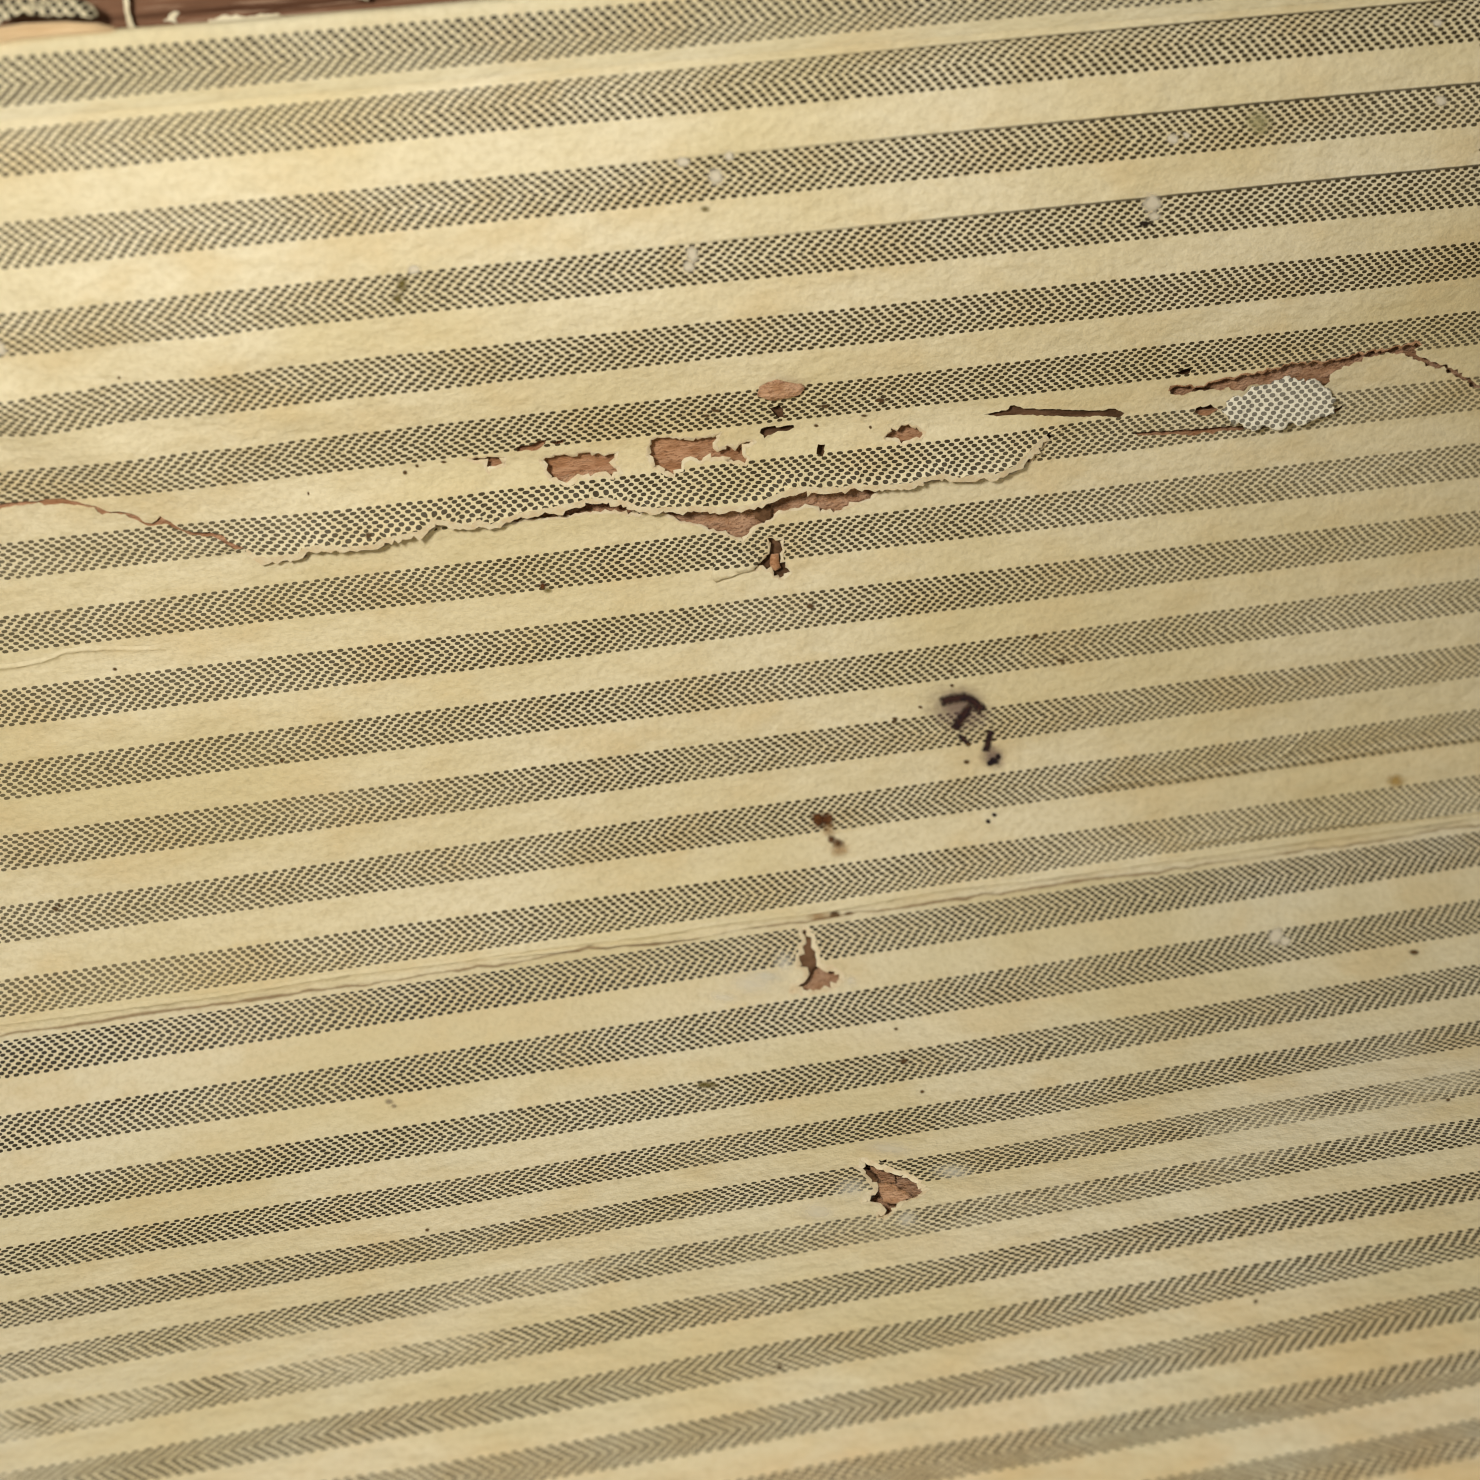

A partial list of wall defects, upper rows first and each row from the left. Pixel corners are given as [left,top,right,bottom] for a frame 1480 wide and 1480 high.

peeling [757,379,805,401]
crack [0,498,243,549]
peeling [712,547,760,582]